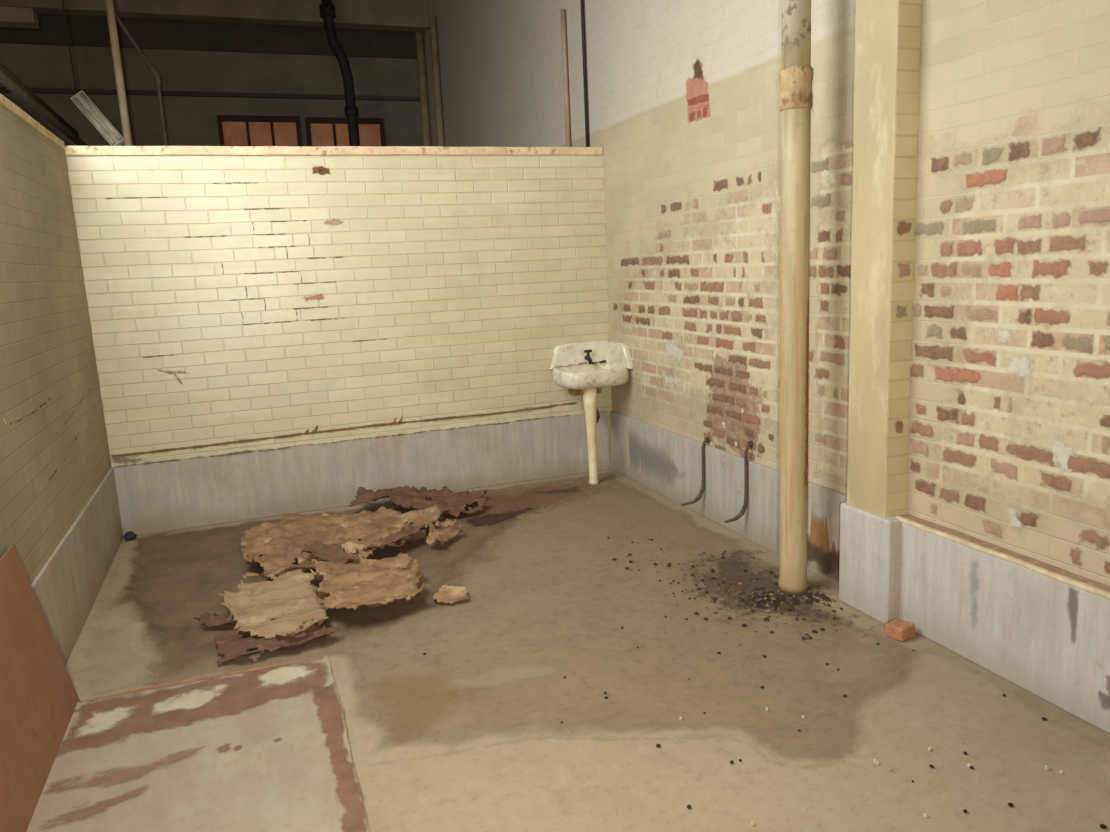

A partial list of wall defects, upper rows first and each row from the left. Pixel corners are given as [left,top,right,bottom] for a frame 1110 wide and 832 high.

peeling [613,172,781,460]
peeling [809,141,853,485]
peeling [895,127,1110,574]
leakage [123,473,914,757]
corrosion [807,516,840,577]
leakage [1069,589,1077,641]
leakage [1098,691,1110,708]